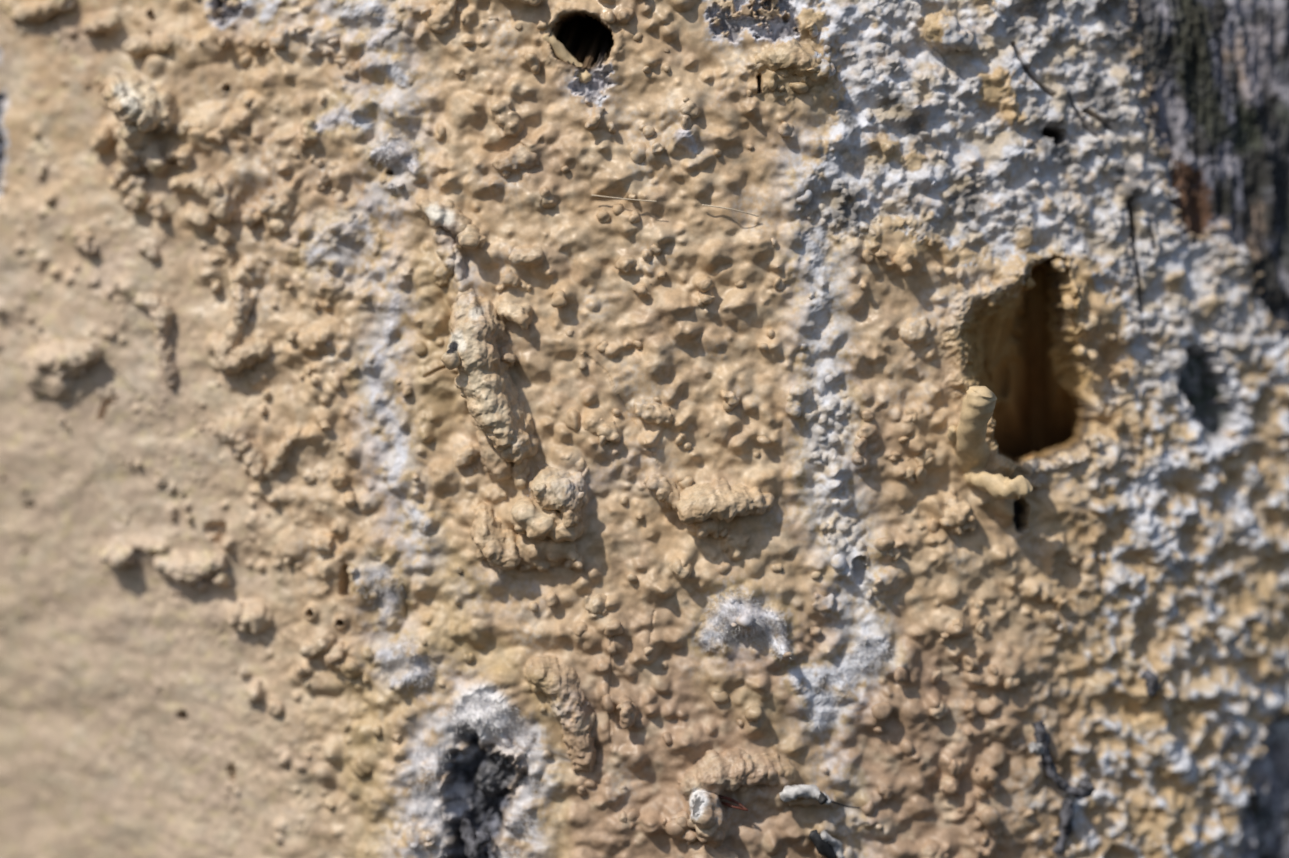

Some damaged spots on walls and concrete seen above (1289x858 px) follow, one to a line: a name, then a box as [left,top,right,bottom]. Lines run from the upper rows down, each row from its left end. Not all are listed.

peeling [707,0,800,43]
spalling [962,259,1094,465]
peeling [475,745,528,797]